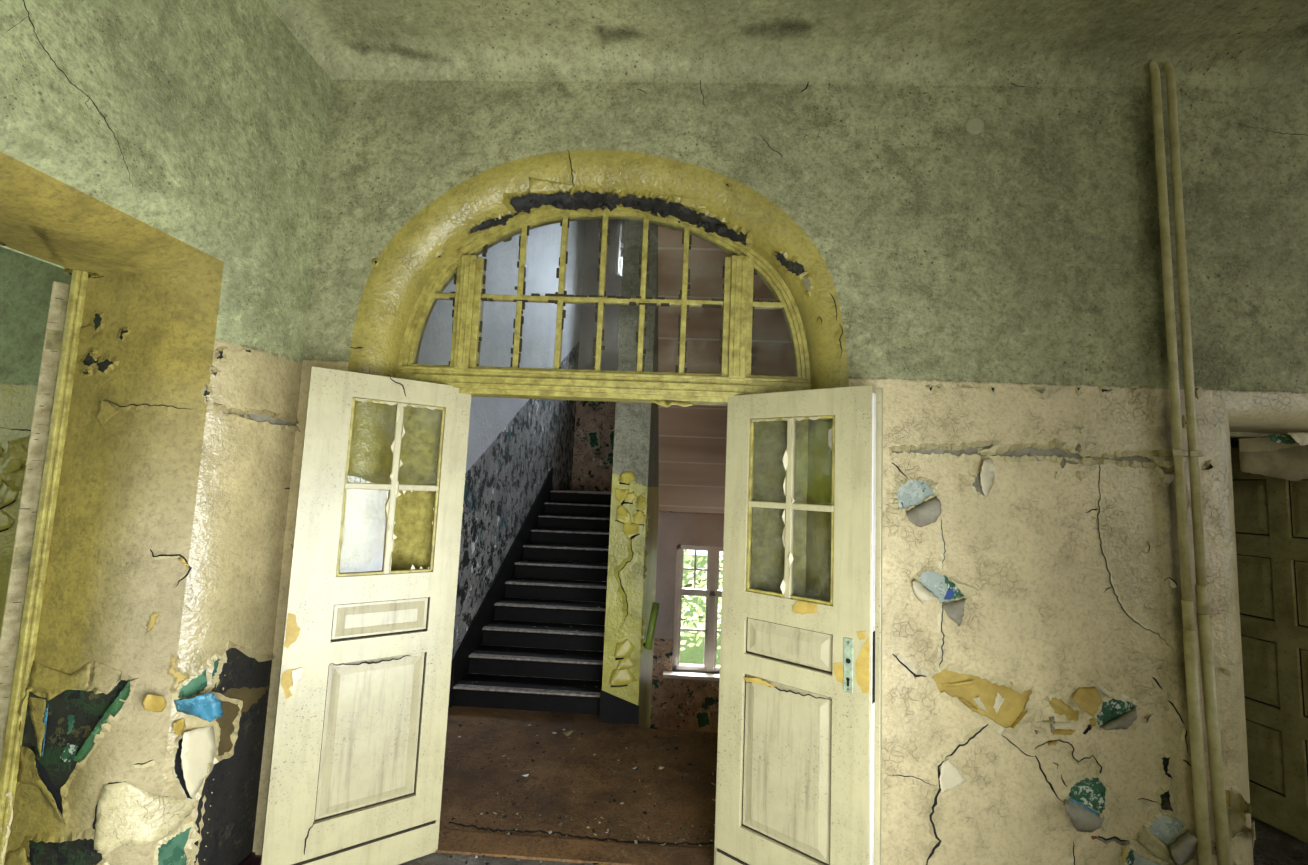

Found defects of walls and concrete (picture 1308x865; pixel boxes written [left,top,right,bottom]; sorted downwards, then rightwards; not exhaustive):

crack [5,0,137,197]
flaking render [467,177,753,248]
peeling [888,425,1175,527]
crack [892,607,945,679]
spalling [912,566,979,626]
crack [1085,465,1176,652]
peeling [0,652,227,865]
crack [942,723,1102,802]
peeling [925,663,1140,746]
crack [1146,677,1192,771]
peeling [892,758,967,865]
crack [1068,836,1130,865]